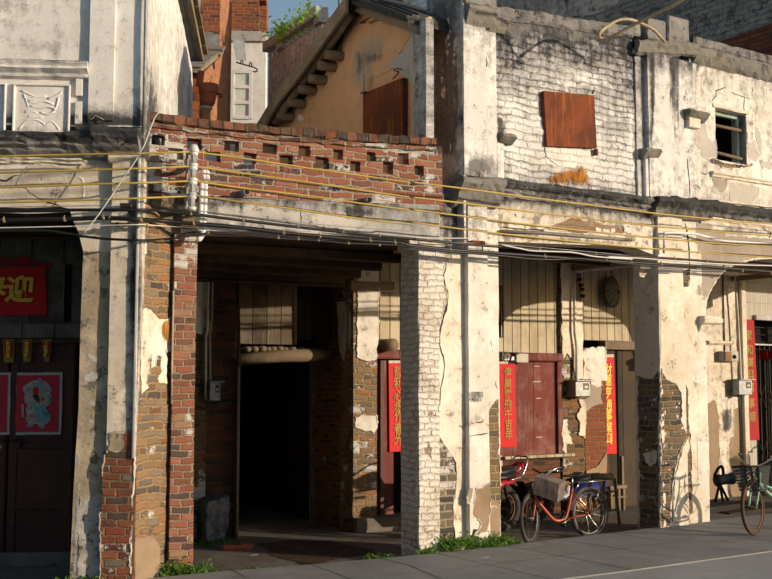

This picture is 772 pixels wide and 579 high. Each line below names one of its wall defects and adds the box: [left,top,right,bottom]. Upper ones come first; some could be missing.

rust [551,165,592,189]
peeling [694,123,772,204]
flaking render [74,428,153,579]
peeling [146,317,172,388]
crack [439,253,448,400]
flaking render [439,438,458,552]
flaking render [466,399,501,539]
flaking render [561,359,608,451]
flaking render [637,368,693,528]